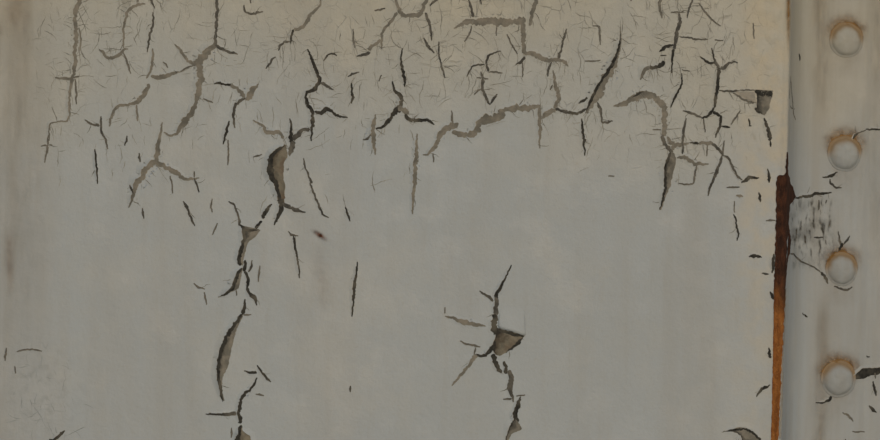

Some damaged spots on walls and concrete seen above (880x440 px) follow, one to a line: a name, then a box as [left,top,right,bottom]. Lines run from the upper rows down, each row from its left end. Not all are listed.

crack [33,0,323,219]
peeling [733,87,777,127]
crack [762,118,774,147]
crack [182,201,196,226]
crack [206,0,772,440]
crack [193,283,210,305]
corrosion [771,152,796,440]
peeling [854,355,880,413]
peeling [722,422,764,440]